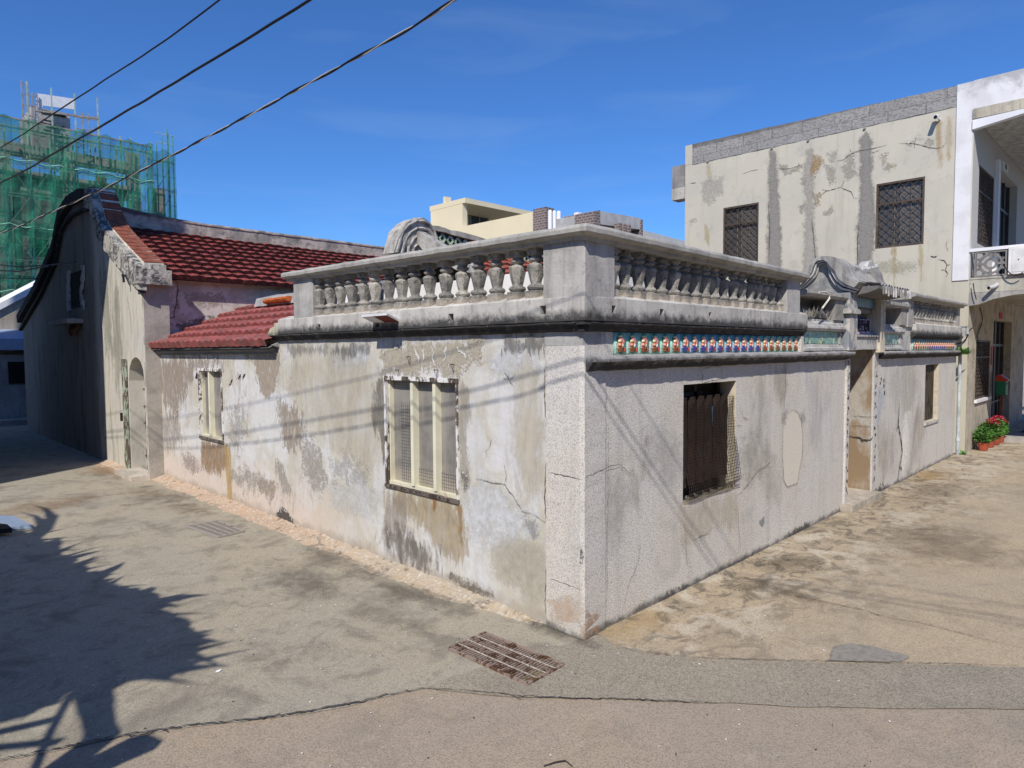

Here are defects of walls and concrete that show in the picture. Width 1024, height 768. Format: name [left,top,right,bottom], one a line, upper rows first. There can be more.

crack [822,143,944,199]
peeling [160,351,372,524]
leakage [332,377,546,600]
crack [479,442,639,608]
crack [842,402,919,480]